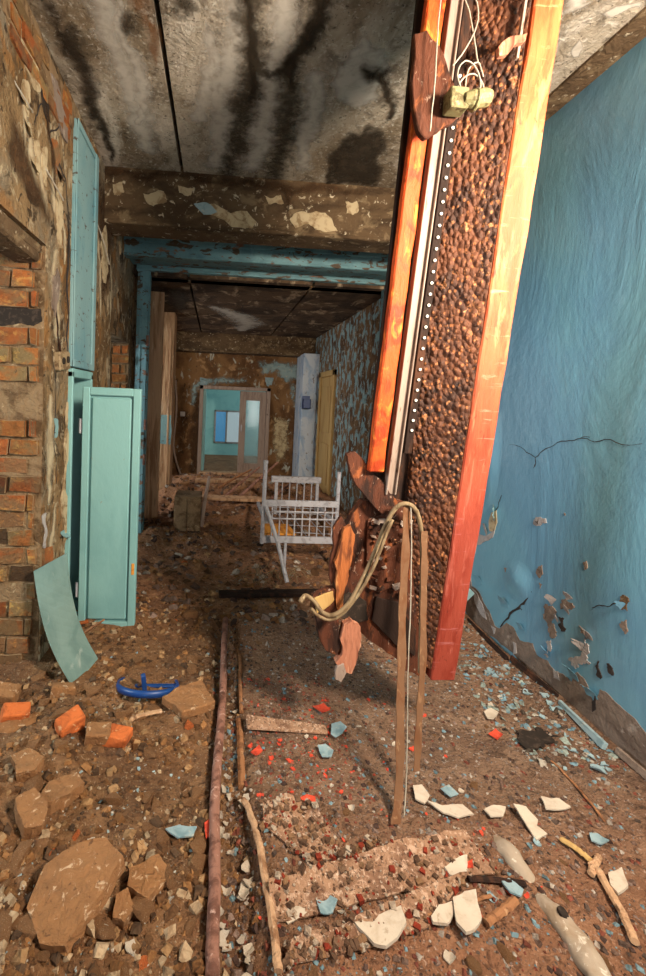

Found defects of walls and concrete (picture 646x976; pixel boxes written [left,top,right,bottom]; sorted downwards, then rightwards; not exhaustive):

damp [44,0,396,211]
damp [9,98,48,217]
peeling [143,190,167,206]
peeling [178,186,256,229]
peeling [290,211,337,232]
peeling [346,201,359,215]
damp [97,189,113,317]
damp [211,307,260,331]
peeling [272,417,289,462]
crack [509,436,638,467]
crack [500,591,532,627]
peeling [465,565,646,769]